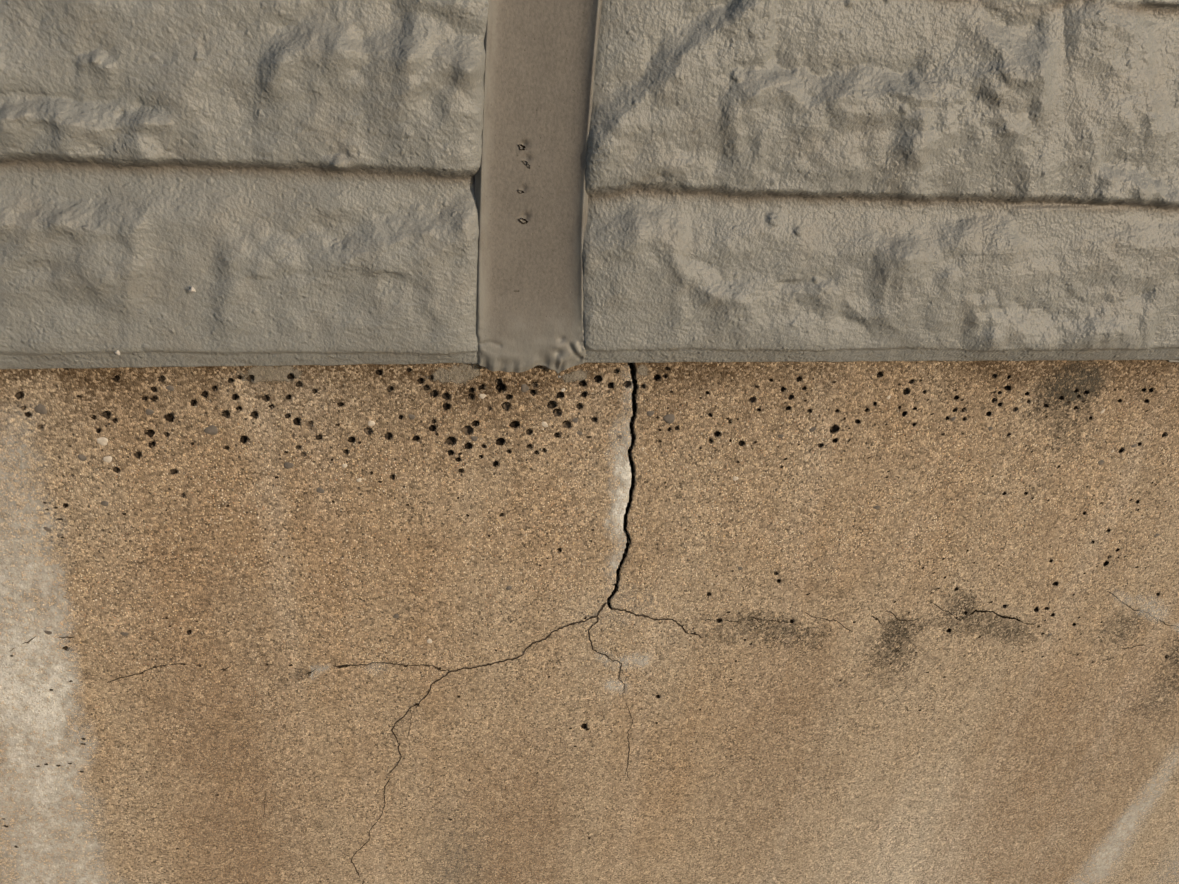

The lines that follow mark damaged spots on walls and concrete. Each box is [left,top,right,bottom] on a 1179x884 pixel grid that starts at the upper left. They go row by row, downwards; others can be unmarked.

leakage [0,494,108,884]
crack [107,663,229,683]
crack [307,363,1034,884]